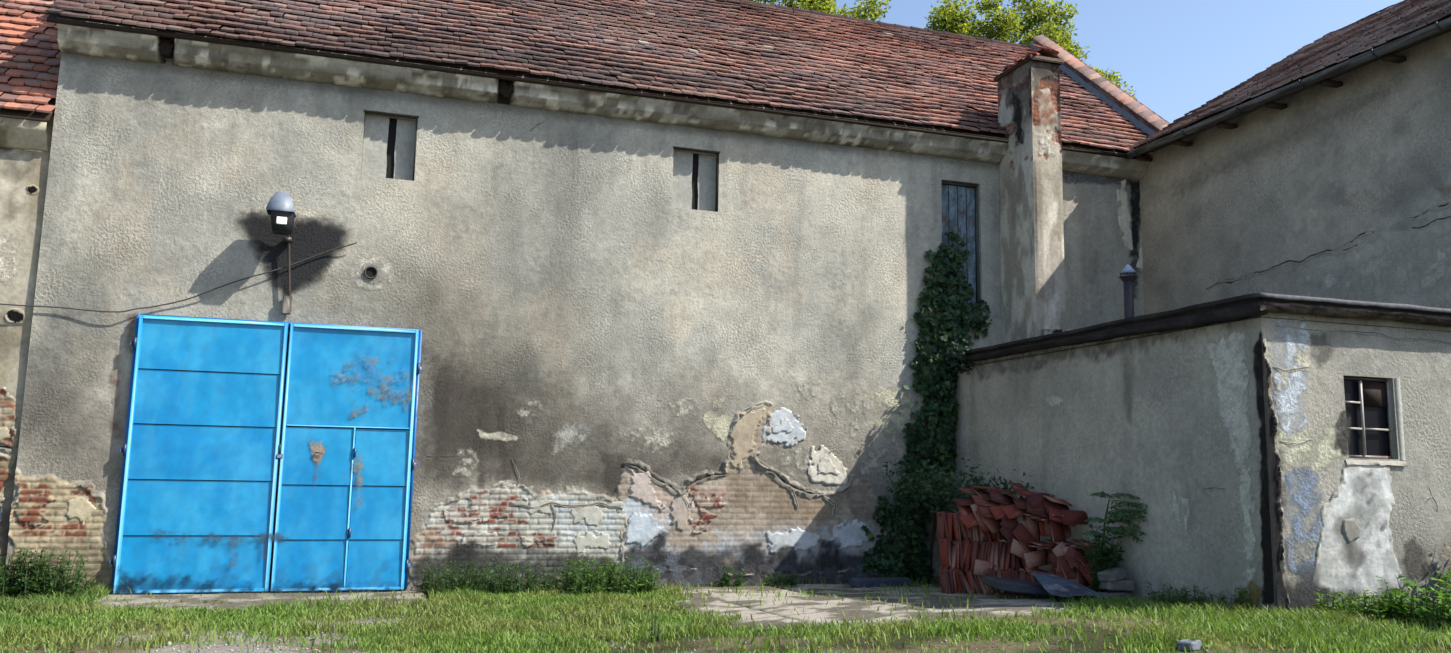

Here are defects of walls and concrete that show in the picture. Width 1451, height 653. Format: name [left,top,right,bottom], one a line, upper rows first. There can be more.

spalling [1033,84,1057,155]
crack [1206,201,1451,289]
spalling [0,387,114,594]
corrosion [310,441,325,464]
corrosion [353,457,364,507]
spalling [408,388,914,587]
spalling [1206,317,1404,609]
water stain [404,532,873,591]